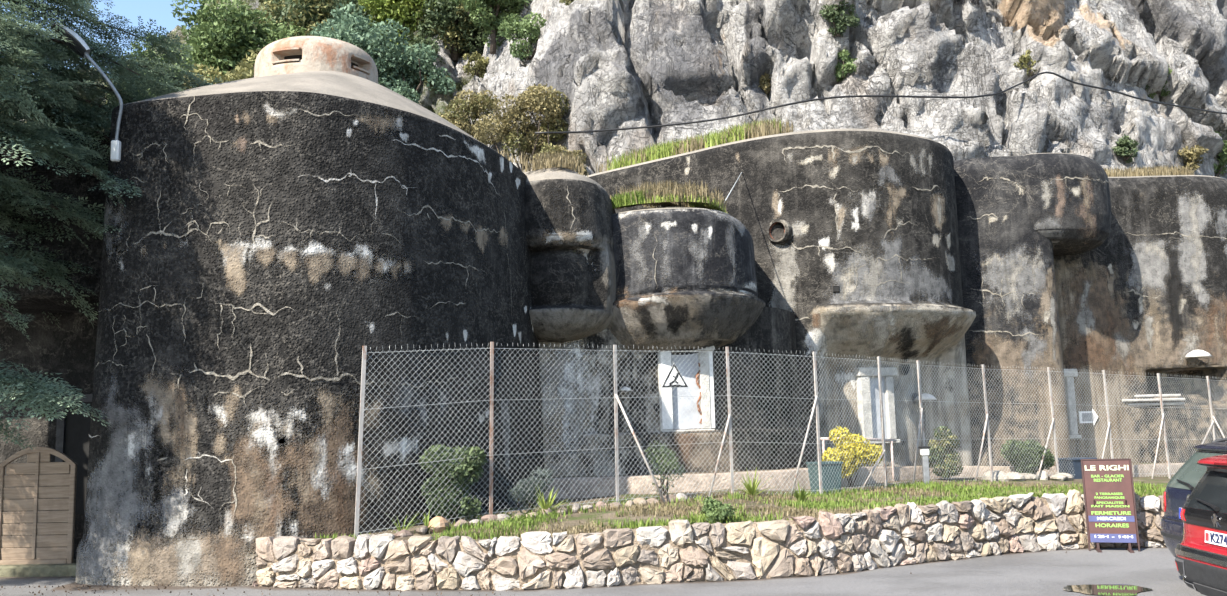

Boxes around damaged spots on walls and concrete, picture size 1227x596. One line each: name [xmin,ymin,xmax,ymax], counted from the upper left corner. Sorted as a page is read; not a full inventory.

leakage [217,238,409,296]
crack [118,97,512,335]
leakage [772,193,784,216]
leakage [819,165,952,362]
leakage [1126,178,1227,374]
crack [93,285,474,405]
leakage [78,377,255,586]
crack [159,454,237,517]
leakage [247,408,294,441]